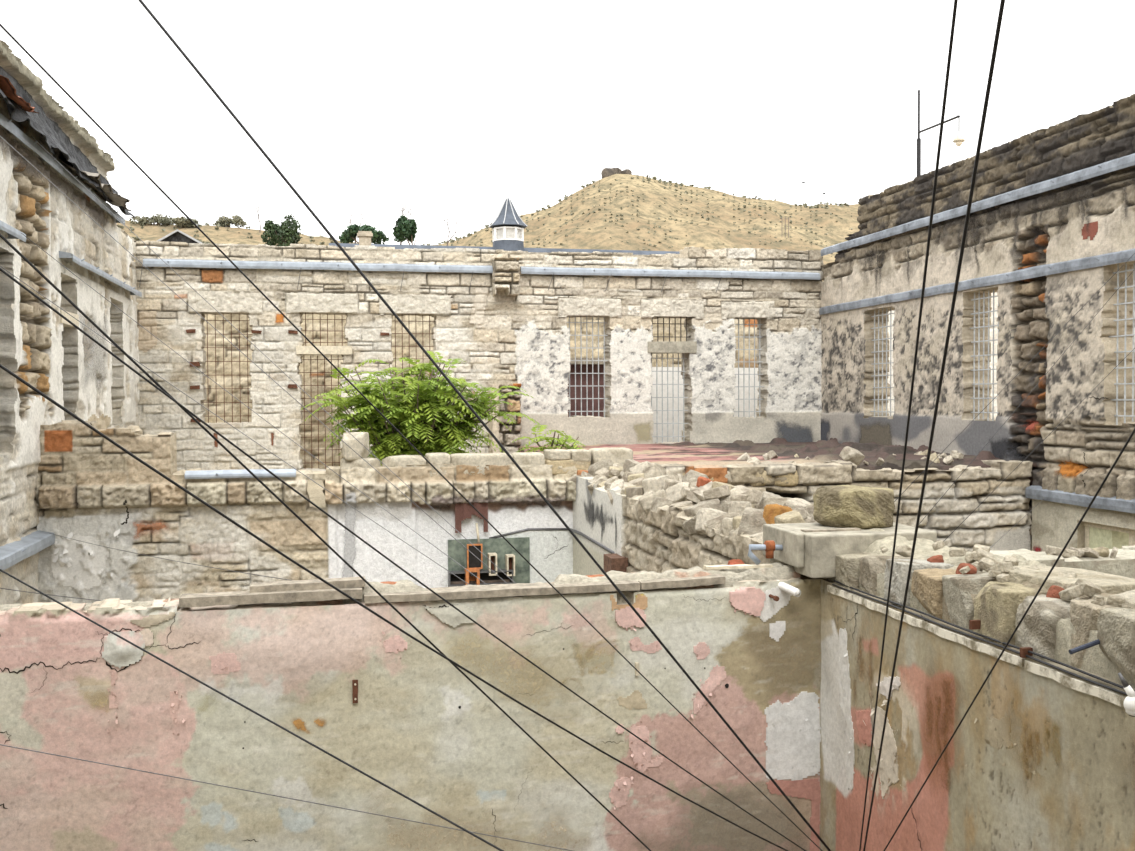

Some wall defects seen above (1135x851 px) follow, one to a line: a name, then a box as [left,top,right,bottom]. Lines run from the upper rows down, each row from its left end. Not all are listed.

crack [0,614,199,693]
rust [293,719,325,731]
peeling [610,593,662,654]
peeling [609,690,664,810]
peeling [690,642,729,718]
peeling [729,586,792,641]
peeling [764,691,821,851]
peeling [838,628,906,799]